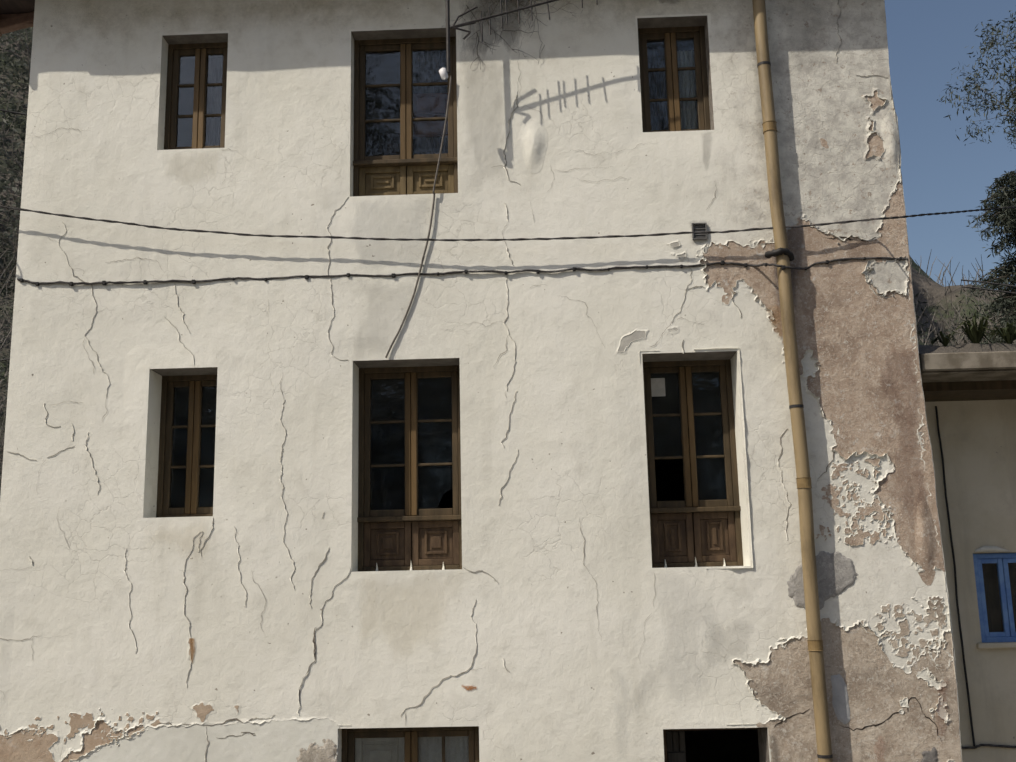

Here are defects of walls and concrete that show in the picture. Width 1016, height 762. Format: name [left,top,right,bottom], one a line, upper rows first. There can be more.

peeling [861,79,896,161]
crack [7,222,111,494]
crack [326,197,349,361]
crack [446,32,605,506]
peeling [666,237,785,364]
peeling [785,157,962,762]
peeling [0,708,167,762]
crack [124,548,138,654]
crack [158,373,351,762]
crack [401,600,510,726]
peeling [731,619,818,762]
crack [842,697,942,742]